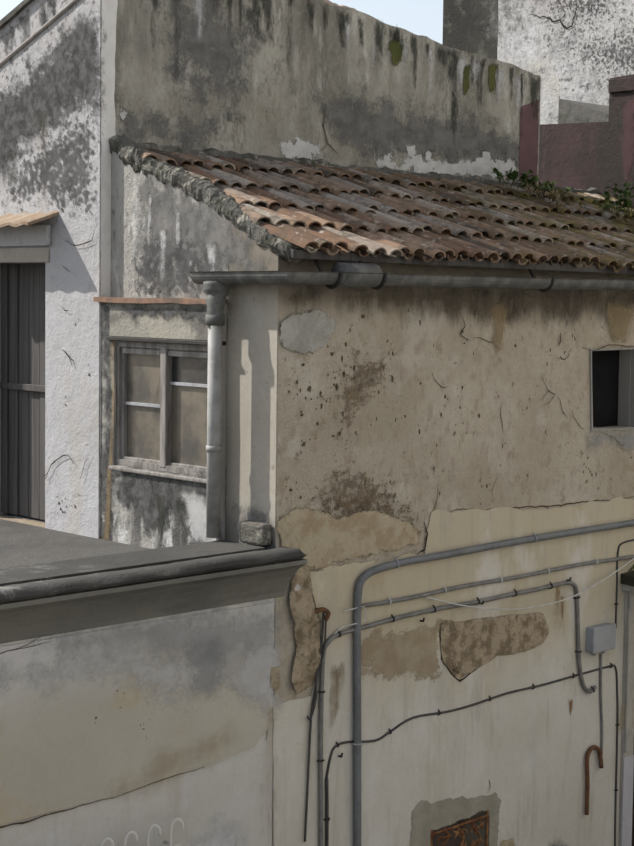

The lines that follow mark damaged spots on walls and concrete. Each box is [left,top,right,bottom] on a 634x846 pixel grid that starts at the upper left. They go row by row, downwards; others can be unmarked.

water stain [0,14,107,183]
water stain [169,0,272,106]
peeling [279,136,323,160]
water stain [338,11,417,80]
water stain [314,44,540,167]
peeling [376,145,516,179]
crack [531,0,578,29]
mould [99,302,207,541]
spalling [288,340,397,449]
spalling [277,456,425,570]
crack [0,635,50,654]
spalling [361,612,549,682]